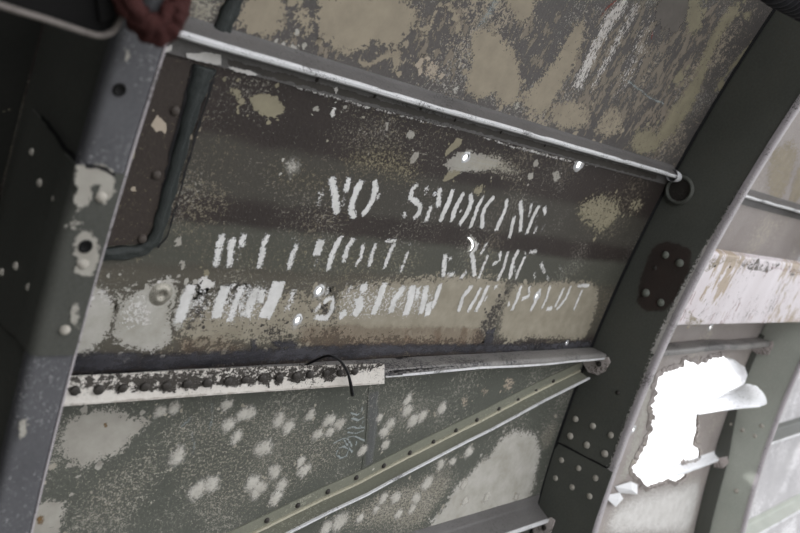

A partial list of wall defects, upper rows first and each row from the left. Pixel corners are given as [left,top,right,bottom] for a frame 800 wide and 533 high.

peeling [186,52,286,125]
peeling [256,86,426,201]
peeling [235,0,752,159]
peeling [64,163,116,277]
peeling [68,231,599,356]
peeling [607,177,754,482]
peeling [33,394,350,533]
peeling [316,414,561,533]